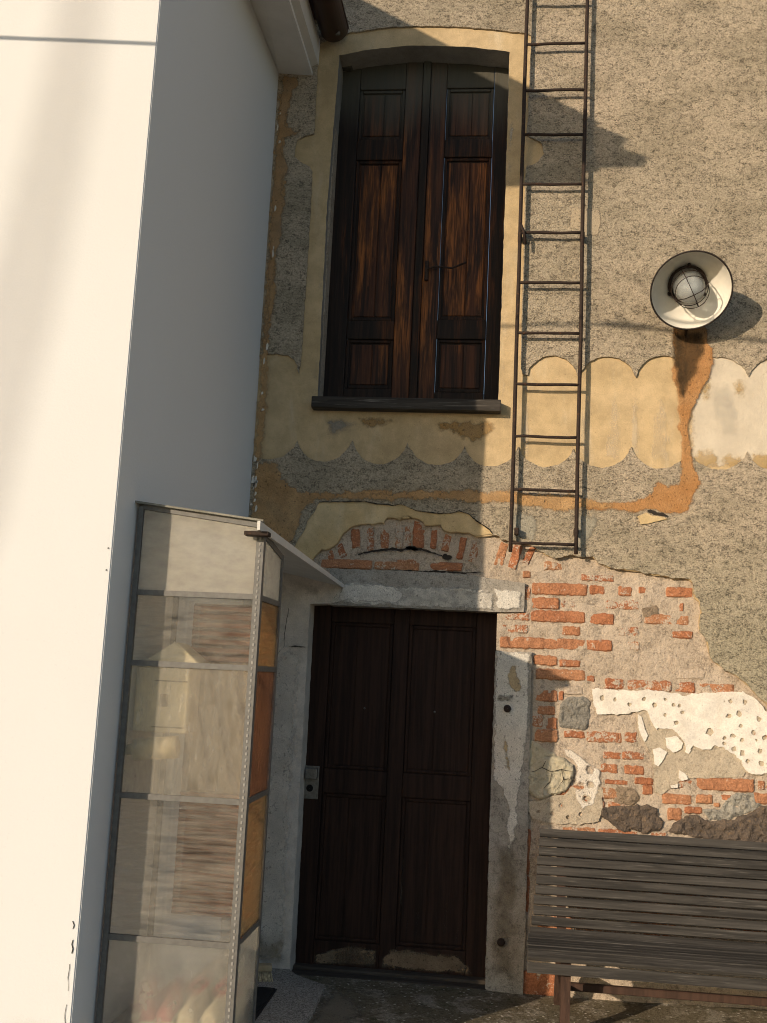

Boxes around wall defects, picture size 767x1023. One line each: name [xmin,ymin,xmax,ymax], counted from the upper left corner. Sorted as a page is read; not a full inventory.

corrosion [251,76,713,542]
crack [358,546,480,574]
flaking render [295,501,767,996]
flaking render [570,963,767,1009]